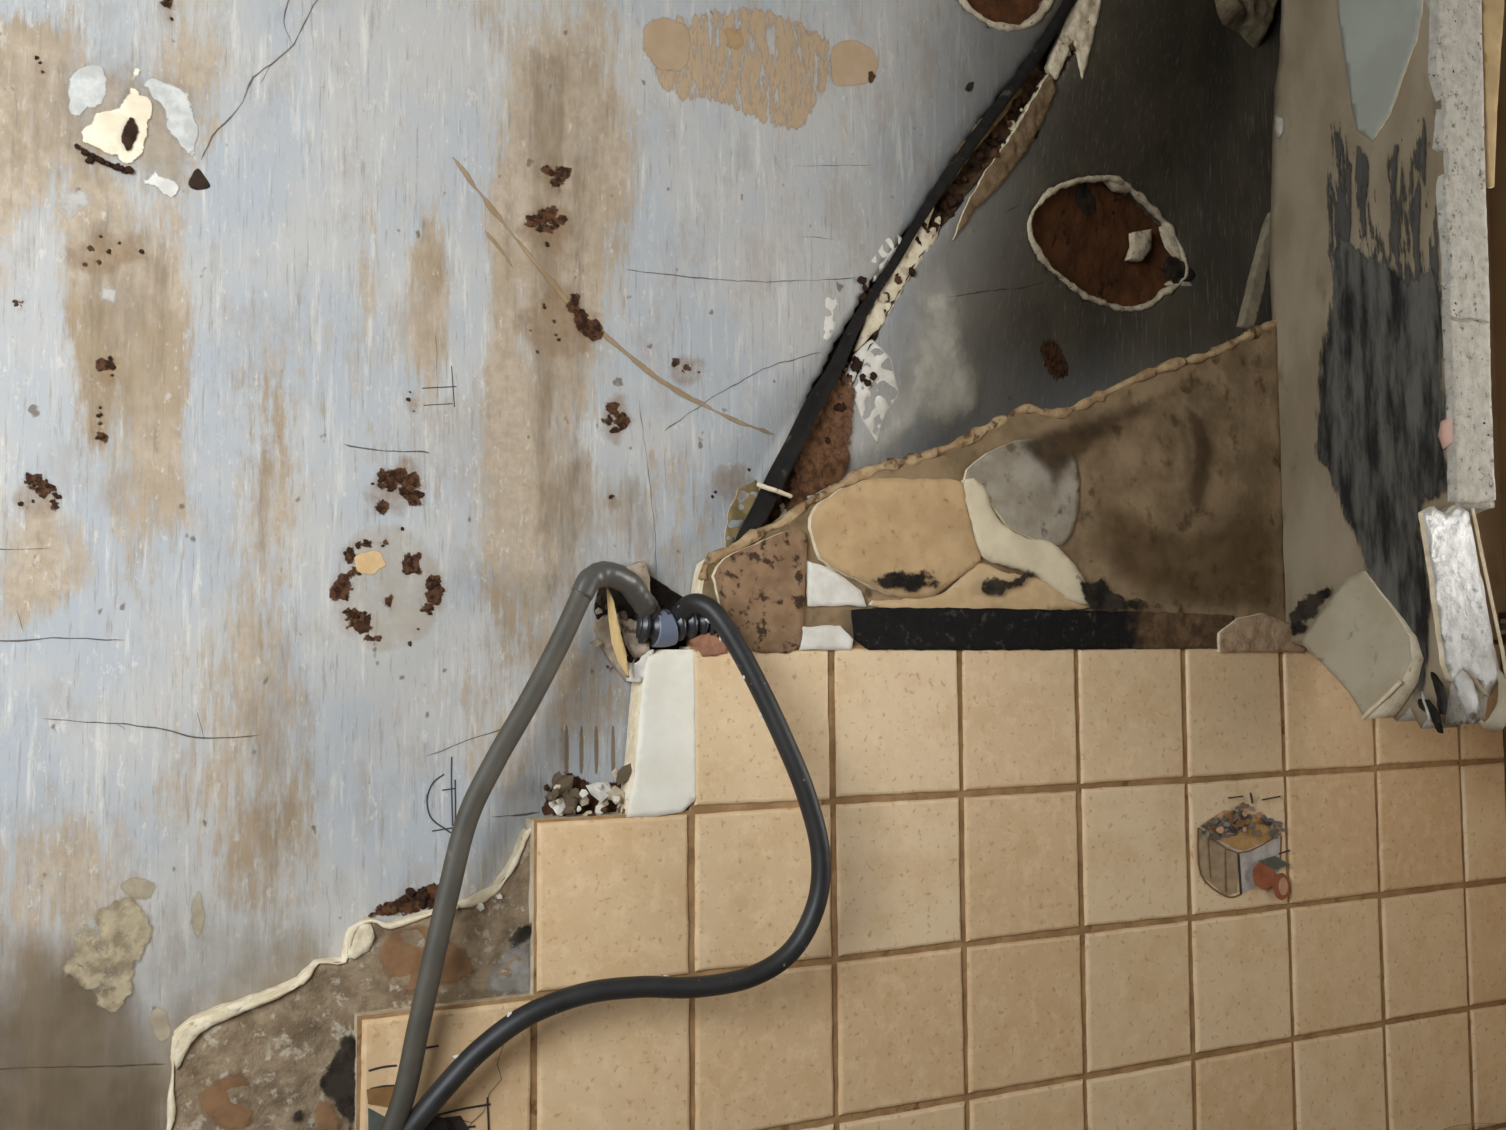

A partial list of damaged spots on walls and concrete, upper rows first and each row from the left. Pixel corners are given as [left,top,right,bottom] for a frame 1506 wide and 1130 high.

spalling [68,65,210,197]
crack [201,0,317,160]
peeling [643,7,878,129]
spalling [959,0,1054,32]
spalling [1027,175,1196,312]
spalling [698,318,1278,580]
leakage [1315,107,1447,694]
peeling [1438,418,1453,449]
peeling [64,878,155,1013]
peeling [192,893,204,936]
peeling [435,818,541,1004]
peeling [149,909,433,1130]